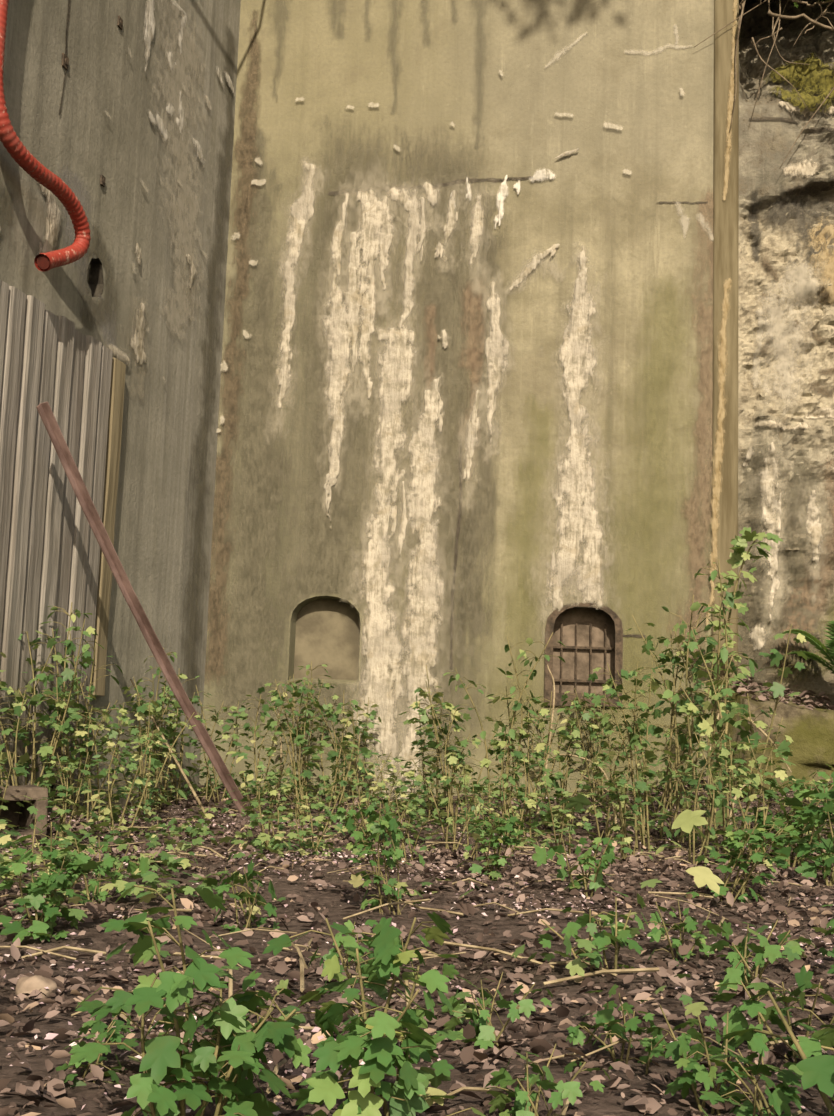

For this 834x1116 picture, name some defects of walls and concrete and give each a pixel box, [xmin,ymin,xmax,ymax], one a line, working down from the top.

water stain [78,256,146,365]
water stain [145,0,579,799]
water stain [548,246,604,611]